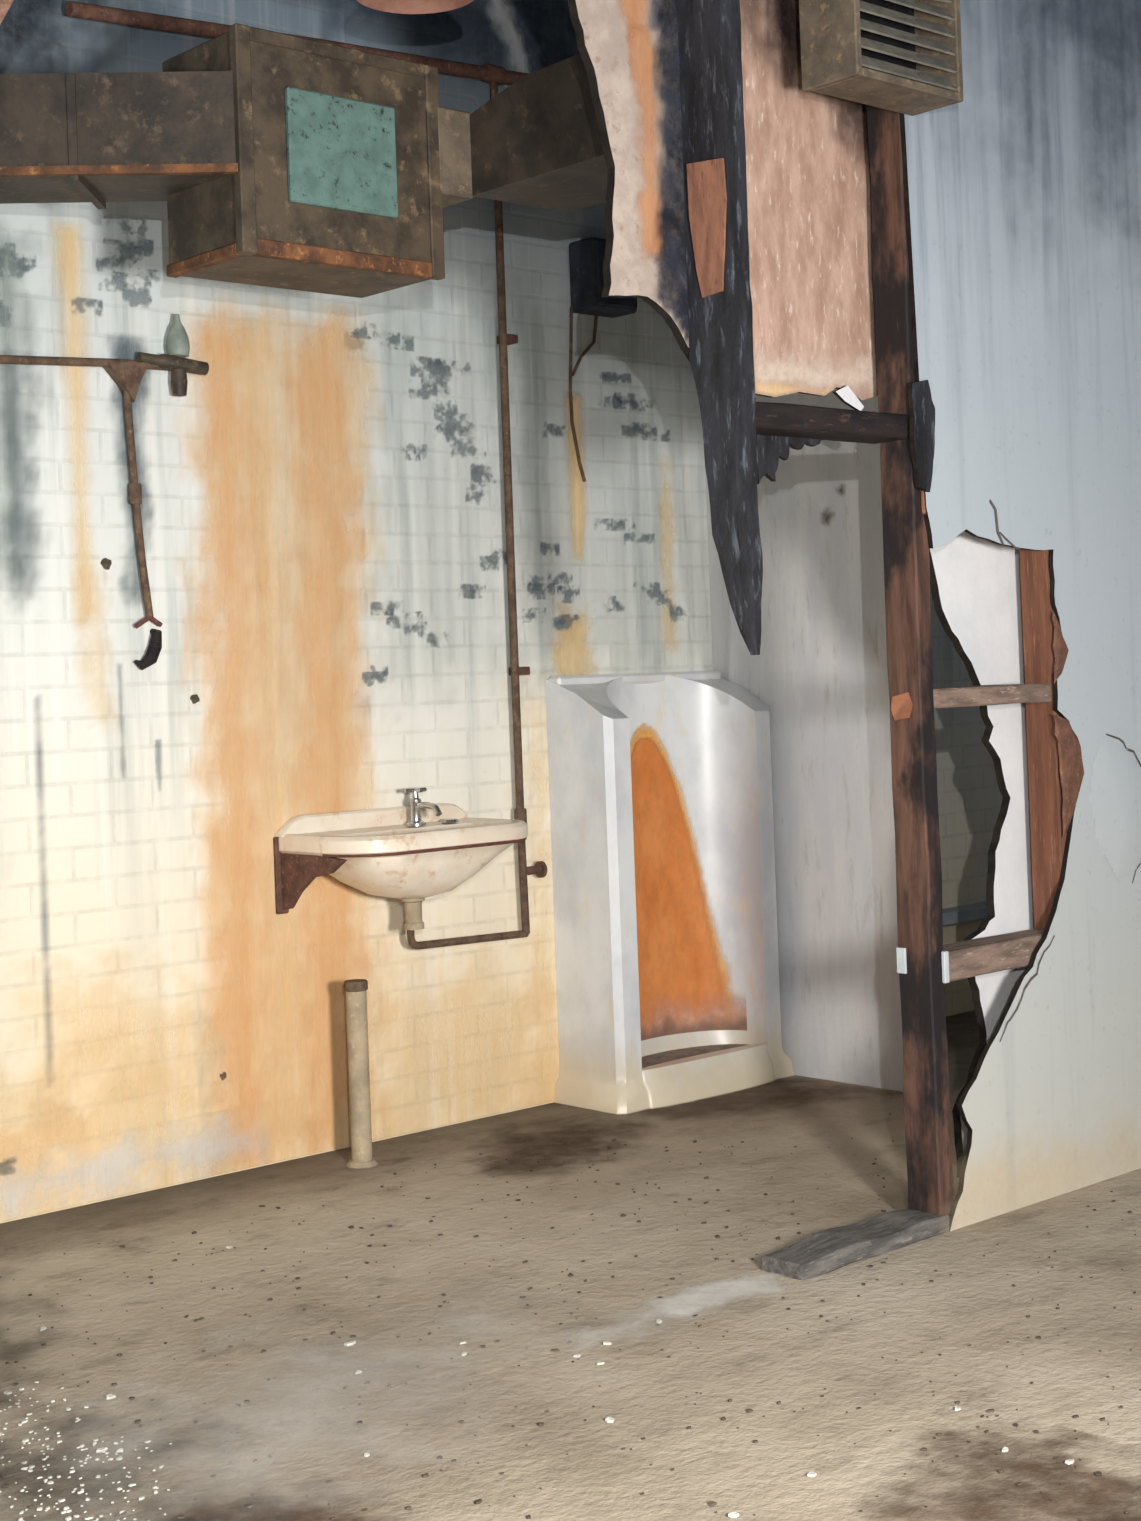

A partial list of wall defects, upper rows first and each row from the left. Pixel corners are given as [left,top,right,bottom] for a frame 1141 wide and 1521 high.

corrosion [622,0,663,254]
peeling [687,158,727,298]
damp [1,253,15,482]
peeling [602,372,669,442]
peeling [603,519,654,542]
peeling [526,573,579,629]
peeling [643,583,683,621]
spalling [1052,611,1069,684]
spalling [1053,714,1084,839]
crack [1106,734,1141,767]